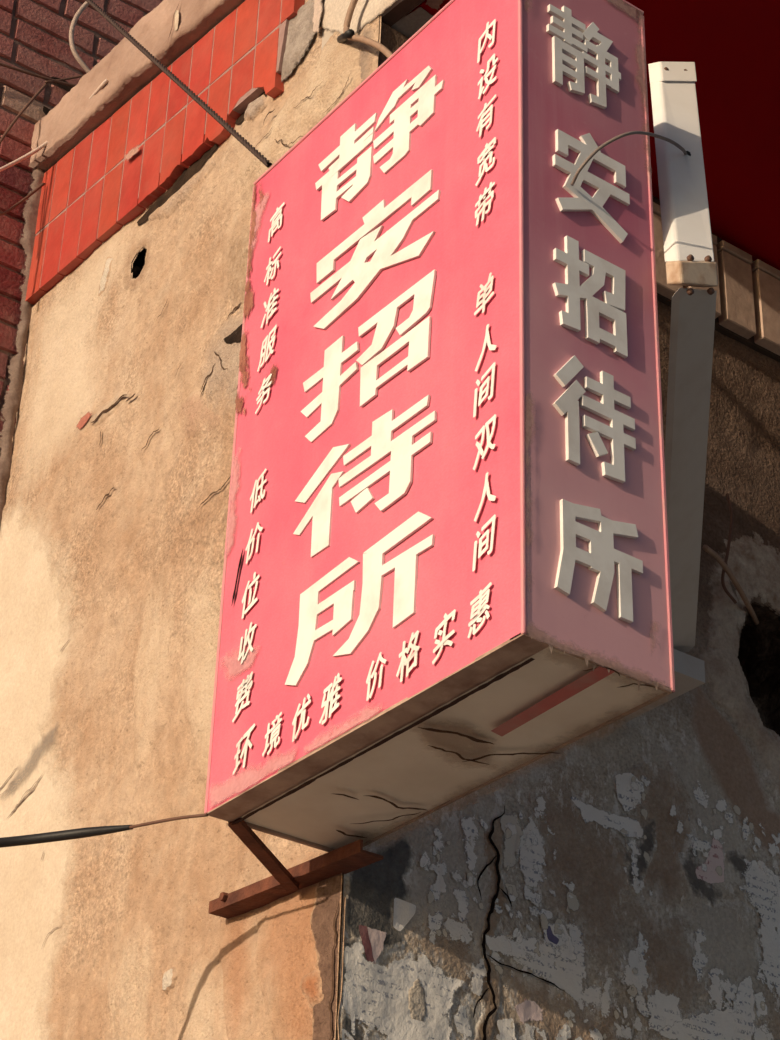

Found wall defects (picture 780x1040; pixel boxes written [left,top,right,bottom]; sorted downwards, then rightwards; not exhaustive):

spalling [235,91,268,125]
spalling [98,144,218,296]
flaking render [177,220,251,438]
flaking render [77,389,135,429]
crack [189,475,231,509]
spalling [687,529,780,859]
corrosion [219,883,324,1040]
corrosion [283,850,328,869]
flaking render [404,918,483,990]
crack [473,806,564,1040]
flaking render [501,963,628,1040]
flaking render [526,761,701,1017]